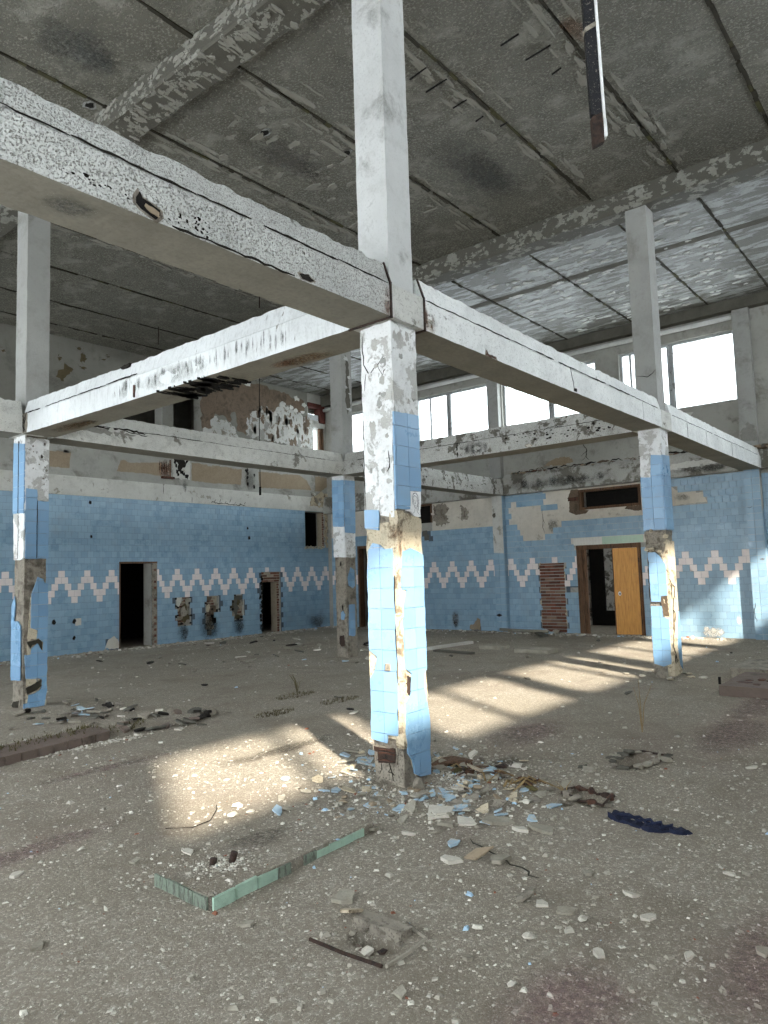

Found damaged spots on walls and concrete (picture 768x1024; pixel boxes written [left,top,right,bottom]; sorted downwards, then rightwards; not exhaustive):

peeling [90,0,358,239]
peeling [404,42,599,223]
crack [0,102,388,283]
peeling [200,383,314,448]
peeling [364,330,416,452]
peeling [423,489,597,553]
peeling [644,529,669,554]
spalling [204,594,243,635]
spalling [661,585,672,617]
spalling [11,679,42,708]
spalling [369,650,391,676]
spalling [373,744,398,765]